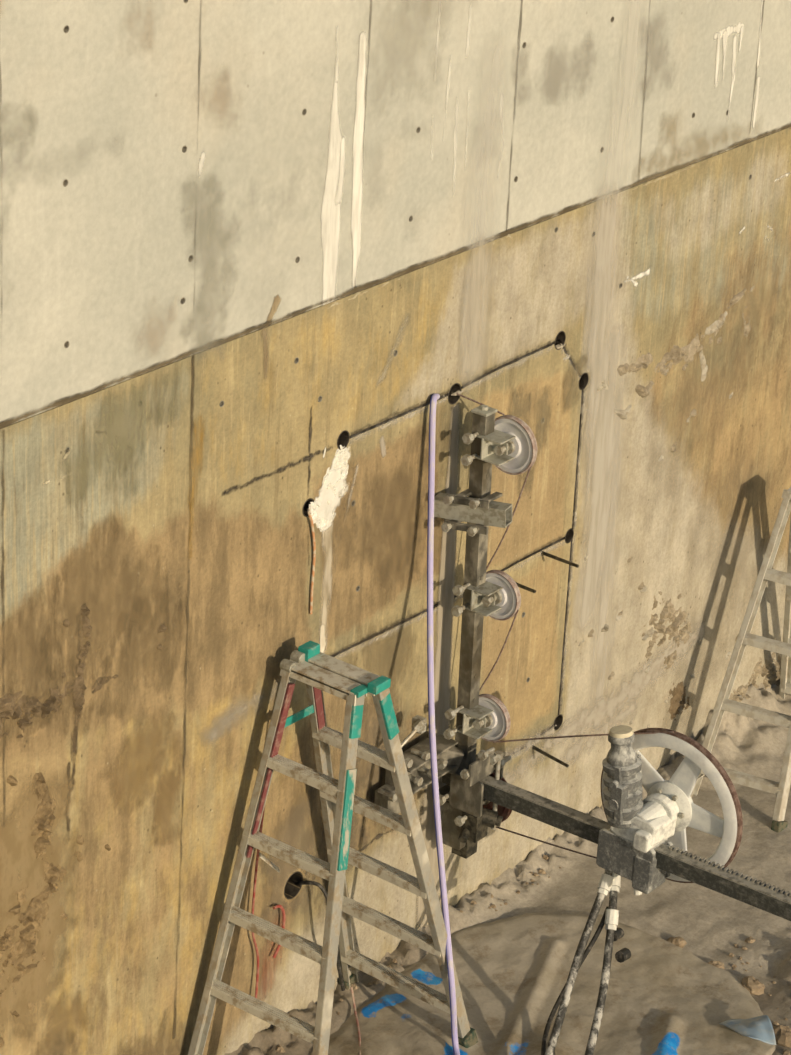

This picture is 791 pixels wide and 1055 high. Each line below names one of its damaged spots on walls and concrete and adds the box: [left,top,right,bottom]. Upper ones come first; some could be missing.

damp [714,22,744,106]
damp [753,0,763,128]
damp [321,32,366,305]
spalling [580,286,755,419]
spalling [636,582,692,673]
spalling [665,671,695,720]
spalling [729,652,782,703]
damp [115,720,177,840]
damp [355,761,386,803]
damp [266,856,309,912]
damp [119,1028,184,1055]